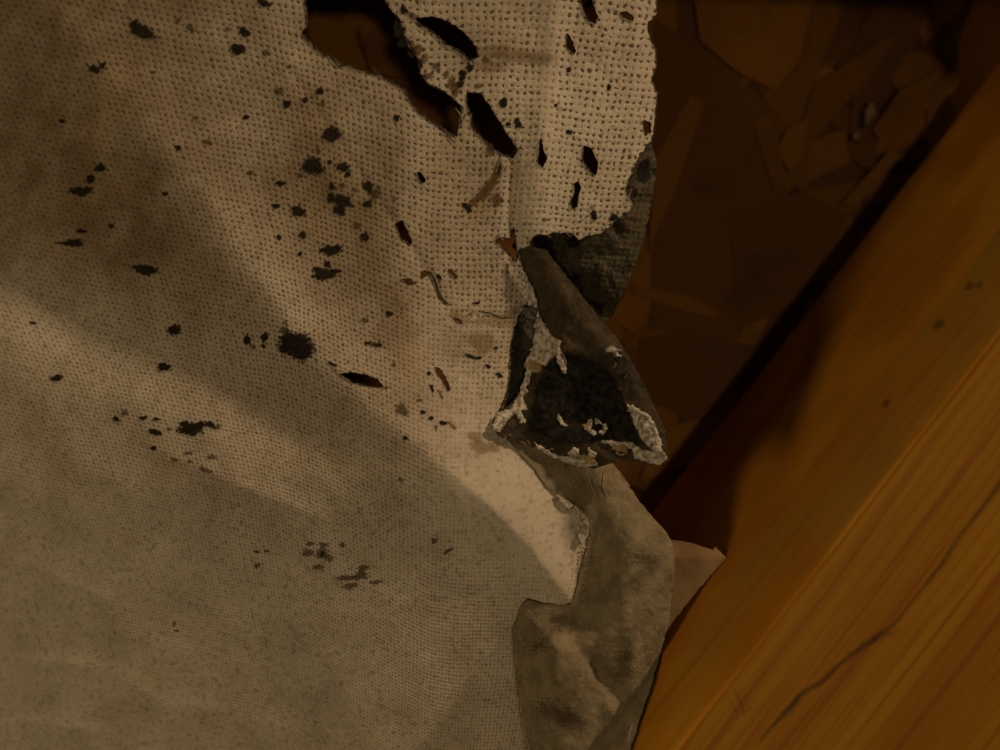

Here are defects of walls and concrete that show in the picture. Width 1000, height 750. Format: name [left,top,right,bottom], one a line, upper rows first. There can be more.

water stain [128,19,159,40]
water stain [226,27,250,55]
water stain [393,5,489,94]
water stain [298,125,381,216]
water stain [271,203,306,216]
water stain [311,243,343,282]
water stain [243,320,320,364]
water stain [113,409,220,450]
peeling [491,144,675,750]
water stain [300,541,345,570]
water stain [333,564,385,591]
crack [760,483,1000,742]